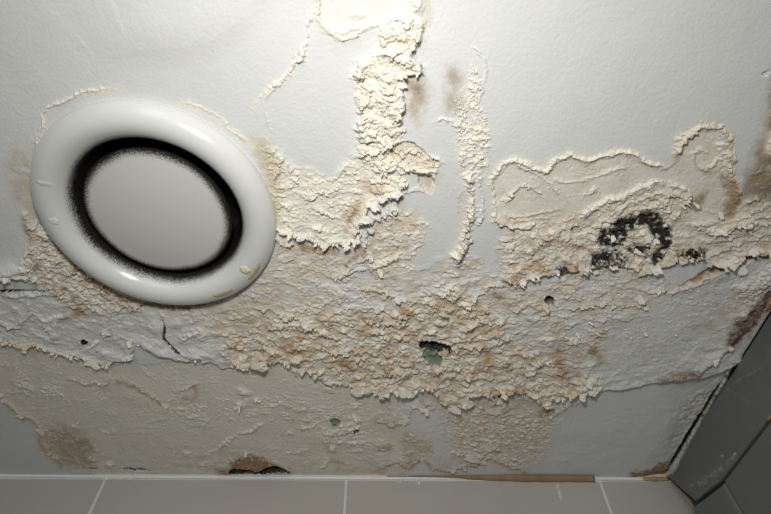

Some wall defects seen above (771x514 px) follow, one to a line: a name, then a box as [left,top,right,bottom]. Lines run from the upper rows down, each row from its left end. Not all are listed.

crack [250,3,322,161]
crack [0,287,49,295]
flaking render [18,214,157,315]
crack [162,321,181,356]
flaking render [192,41,771,410]
leakage [591,210,672,270]
leakage [722,147,771,216]
flaking render [0,345,595,483]
spalling [667,368,731,475]